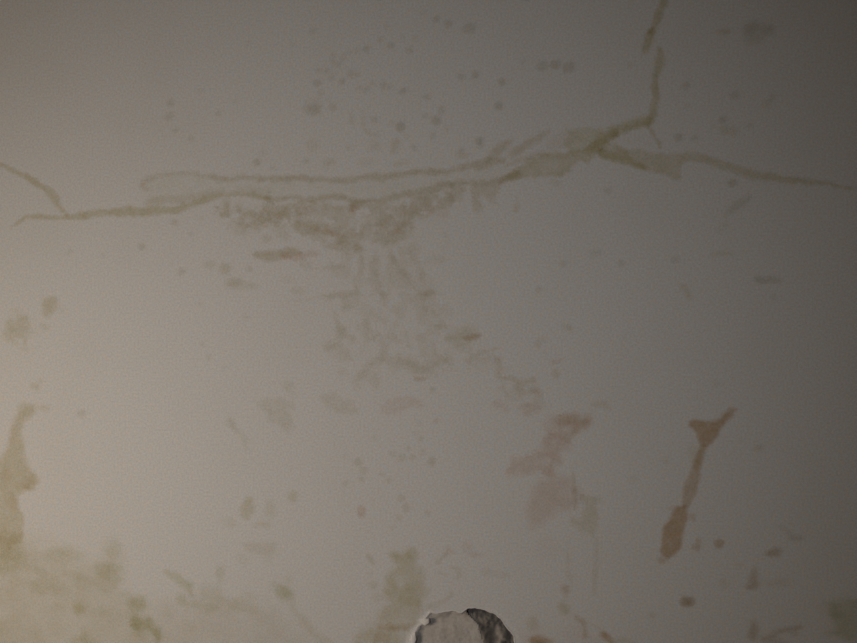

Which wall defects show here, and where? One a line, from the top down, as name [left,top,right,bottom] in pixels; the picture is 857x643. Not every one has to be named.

spalling [410,607,515,643]